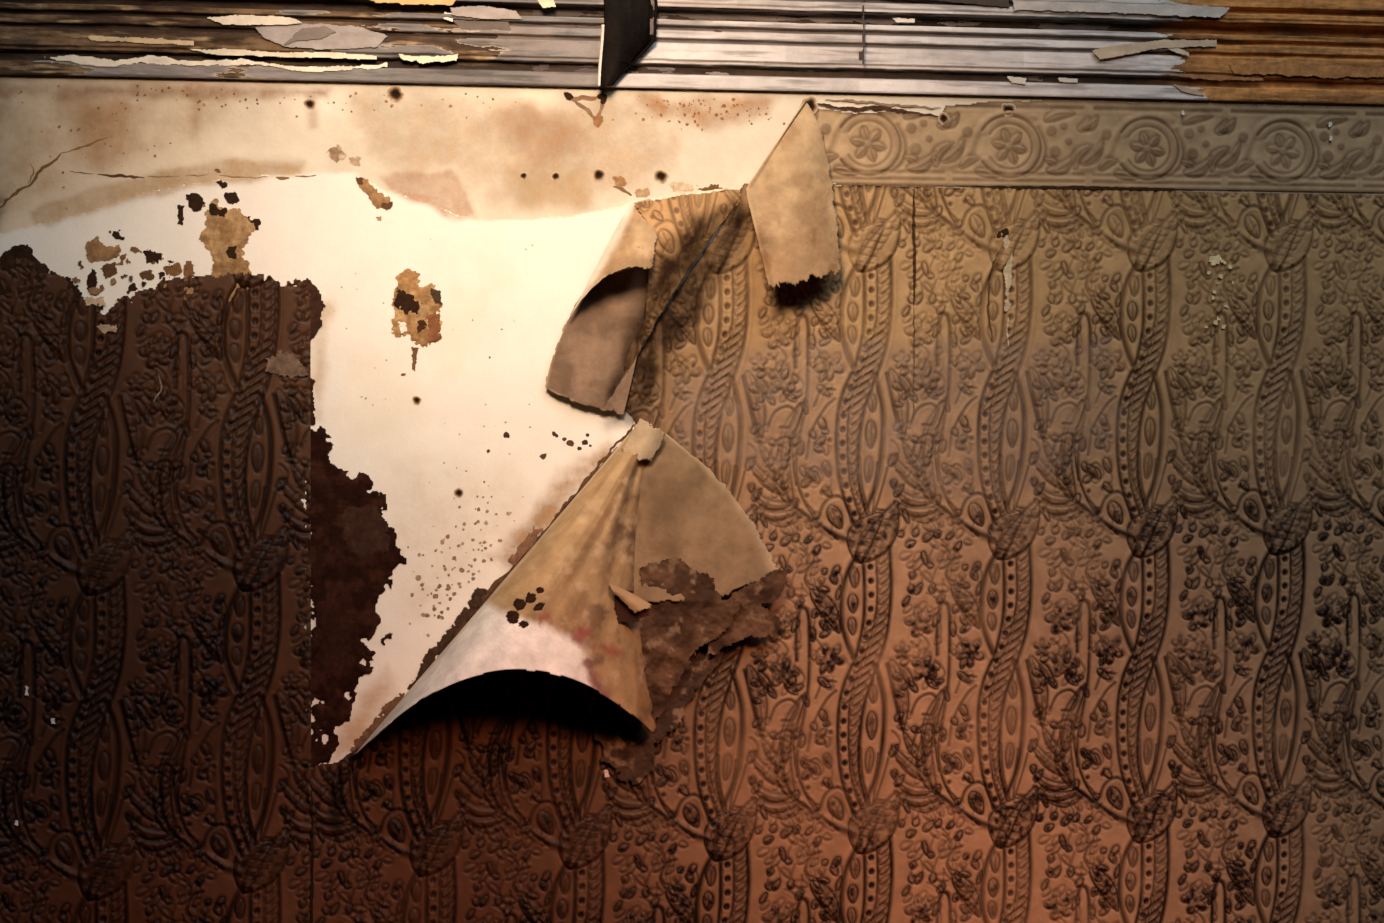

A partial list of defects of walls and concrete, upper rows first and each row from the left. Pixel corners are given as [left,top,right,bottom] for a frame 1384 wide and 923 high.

peeling [44,14,458,72]
peeling [371,0,522,33]
peeling [538,0,556,8]
peeling [938,0,1229,18]
peeling [177,169,261,231]
peeling [327,145,393,221]
peeling [72,230,196,306]
peeling [96,324,117,334]
peeling [303,278,326,341]
peeling [424,288,442,344]
peeling [307,378,315,425]
peeling [342,504,390,561]